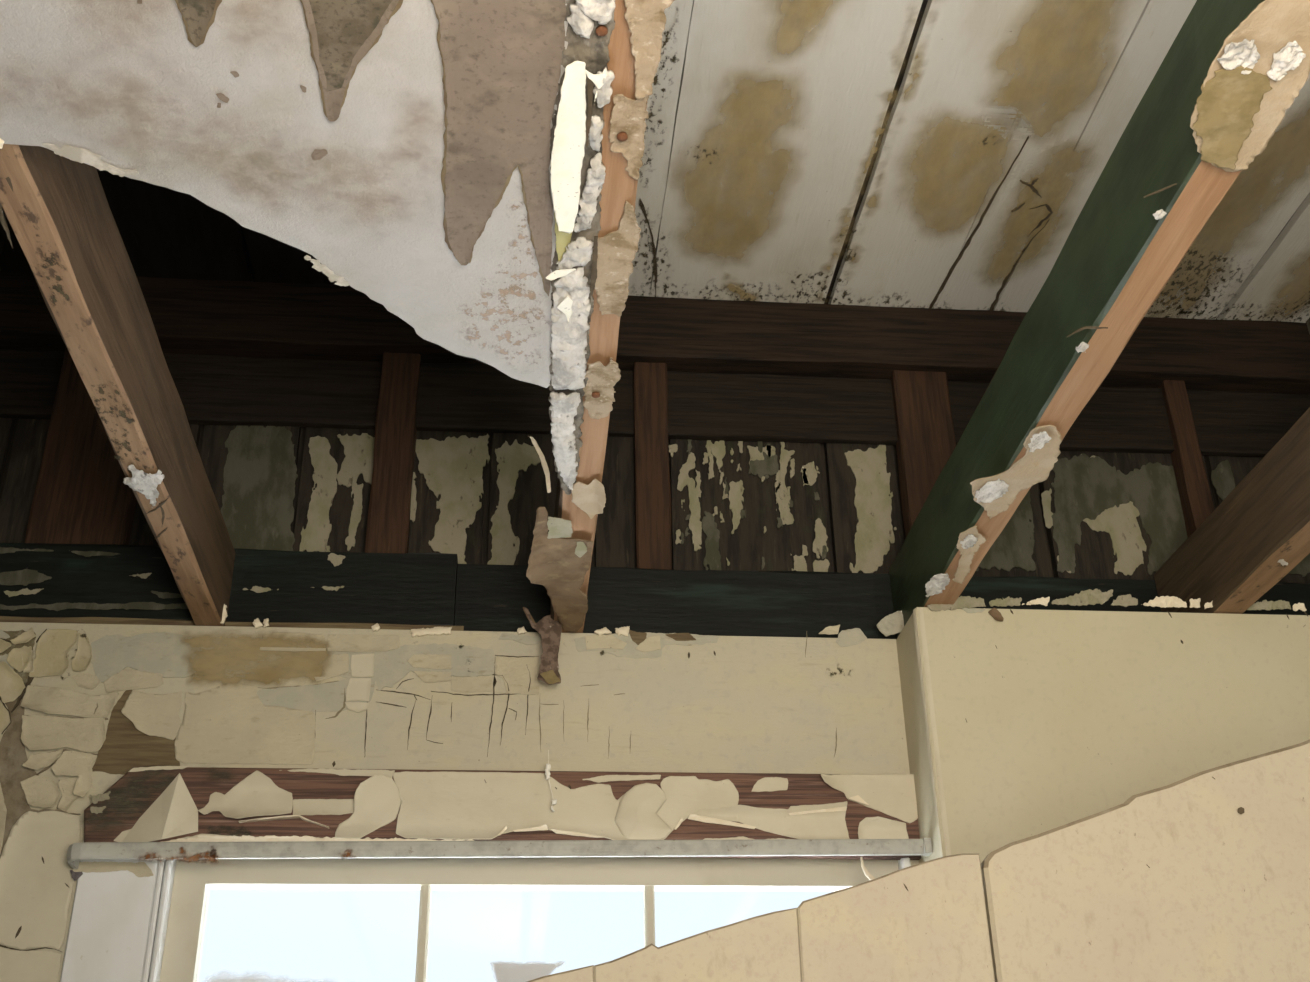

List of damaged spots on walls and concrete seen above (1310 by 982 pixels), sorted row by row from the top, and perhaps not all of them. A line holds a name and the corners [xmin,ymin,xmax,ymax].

peeling [546,61,606,281]
leakage [683,78,796,258]
leakage [909,0,1113,232]
leakage [1149,108,1310,324]
peeling [410,433,541,565]
peeling [927,453,1213,622]
crack [0,676,108,734]
crack [32,749,99,815]
leakage [184,636,329,684]
peeling [0,627,918,982]
crack [364,655,631,758]
crack [0,944,61,952]